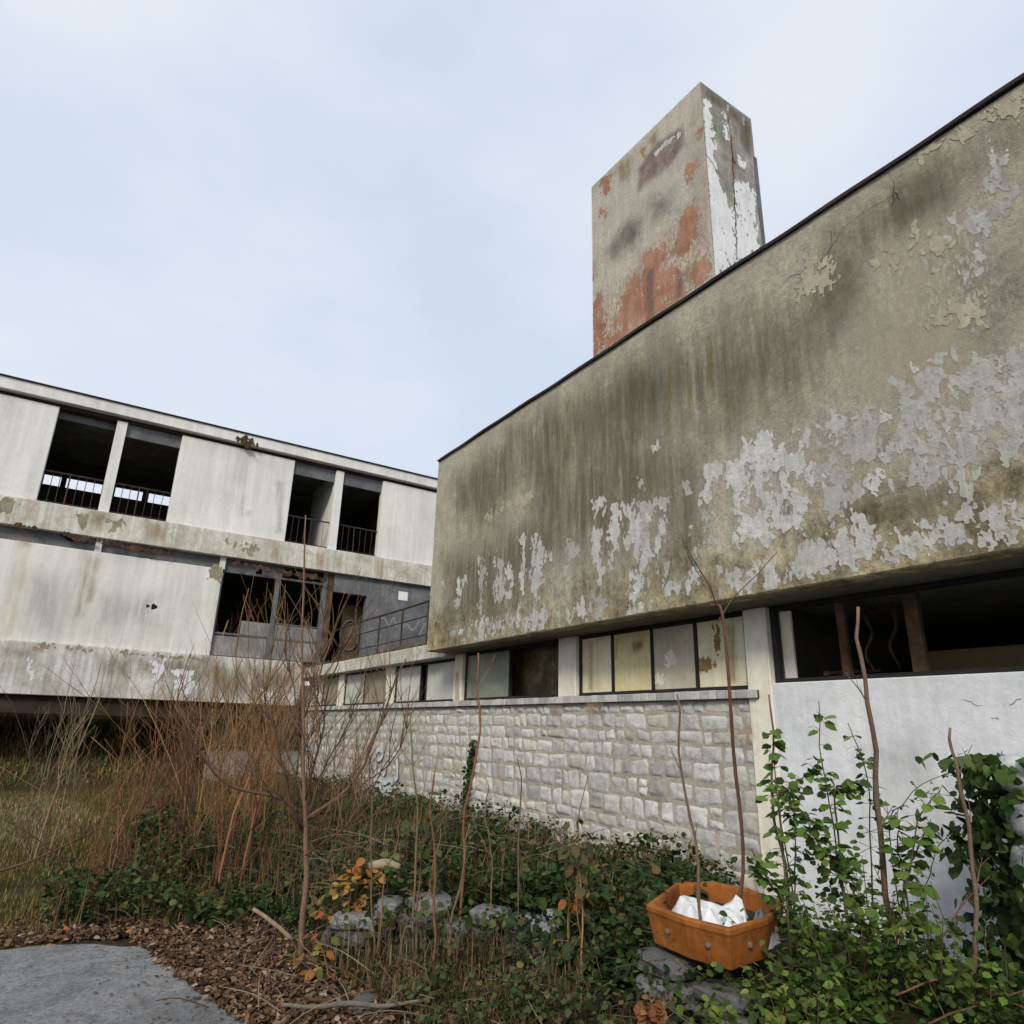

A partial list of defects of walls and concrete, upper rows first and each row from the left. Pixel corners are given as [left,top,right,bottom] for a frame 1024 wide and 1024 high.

flaking render [593,98,760,357]
flaking render [794,247,841,306]
crack [781,181,900,286]
flaking render [868,87,1024,331]
leakage [676,329,800,404]
peeling [430,345,1024,642]
spalling [27,641,94,681]
peeling [119,649,208,695]